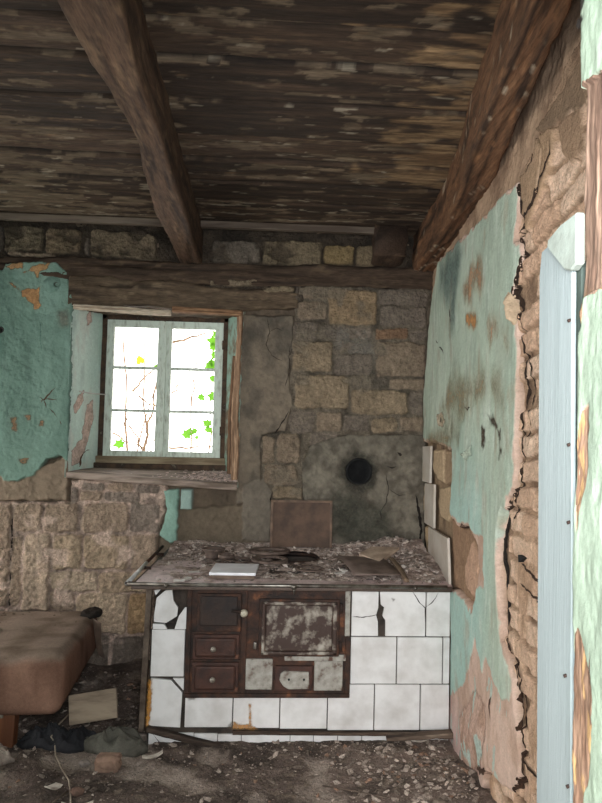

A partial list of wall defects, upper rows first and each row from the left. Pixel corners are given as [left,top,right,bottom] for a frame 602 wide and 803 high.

peeling [72,390,94,466]
flaking render [0,479,168,666]
crack [380,452,422,539]
crack [503,133,550,796]
flaking render [489,41,602,803]